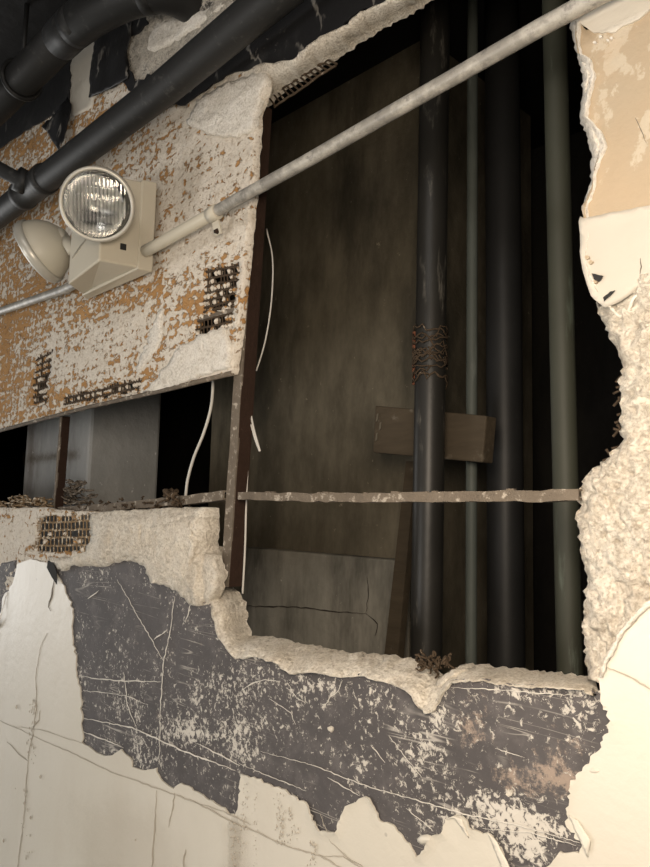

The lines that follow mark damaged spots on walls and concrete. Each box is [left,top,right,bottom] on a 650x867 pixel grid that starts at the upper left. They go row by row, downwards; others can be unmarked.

flaking render [0,178,11,196]
flaking render [0,0,235,171]
flaking render [89,0,431,239]
flaking render [0,186,259,429]
flaking render [569,11,650,683]
crack [0,634,363,867]
peeling [0,507,610,867]
crack [248,580,378,635]